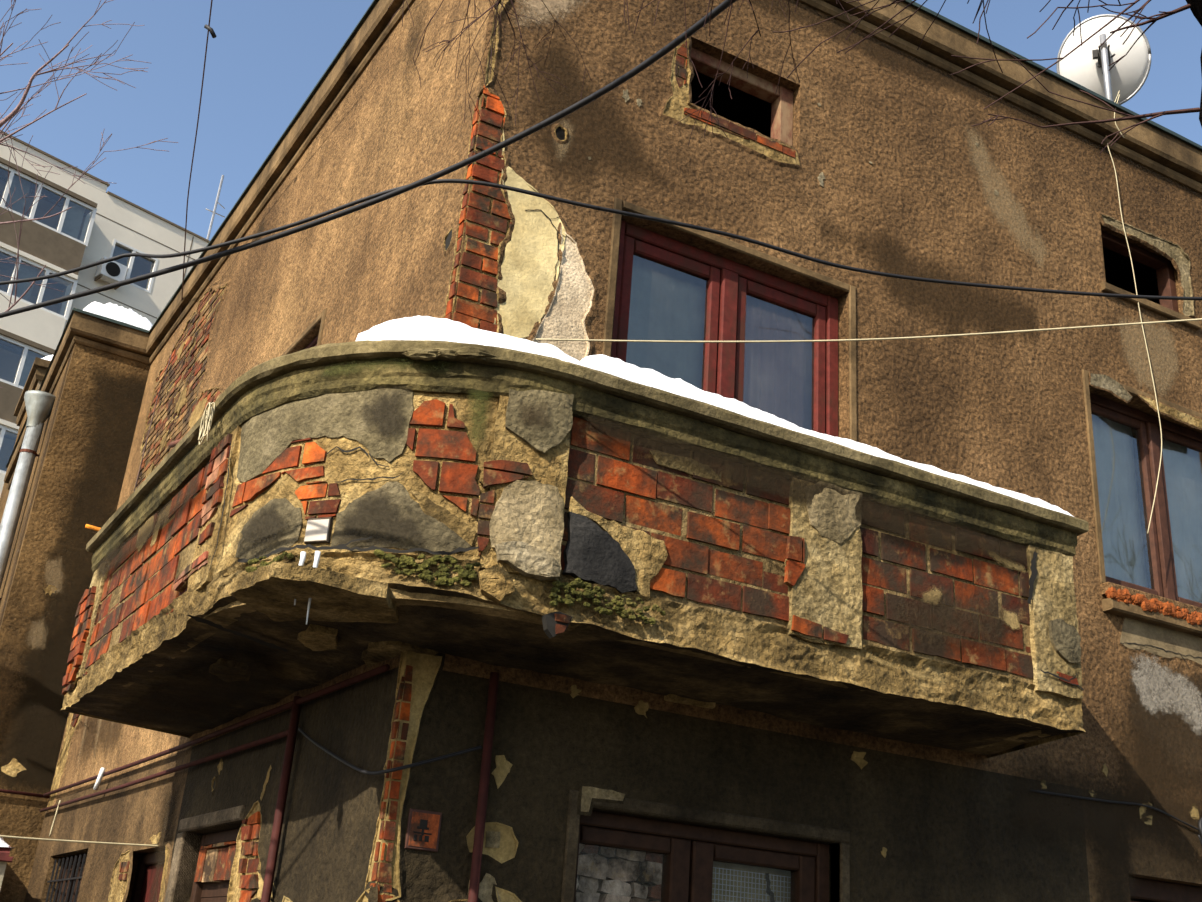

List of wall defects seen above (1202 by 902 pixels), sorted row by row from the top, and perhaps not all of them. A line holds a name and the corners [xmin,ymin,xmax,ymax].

flaking render [443,0,600,361]
water stain [543,48,644,183]
flaking render [659,31,802,169]
water stain [858,237,1036,332]
flaking render [133,277,231,492]
flaking render [173,388,668,651]
flaking render [784,482,863,588]
flaking render [62,586,96,695]
flaking render [47,713,84,814]
flaking render [108,845,133,902]
flaking render [194,765,299,902]
flaking render [356,650,446,902]